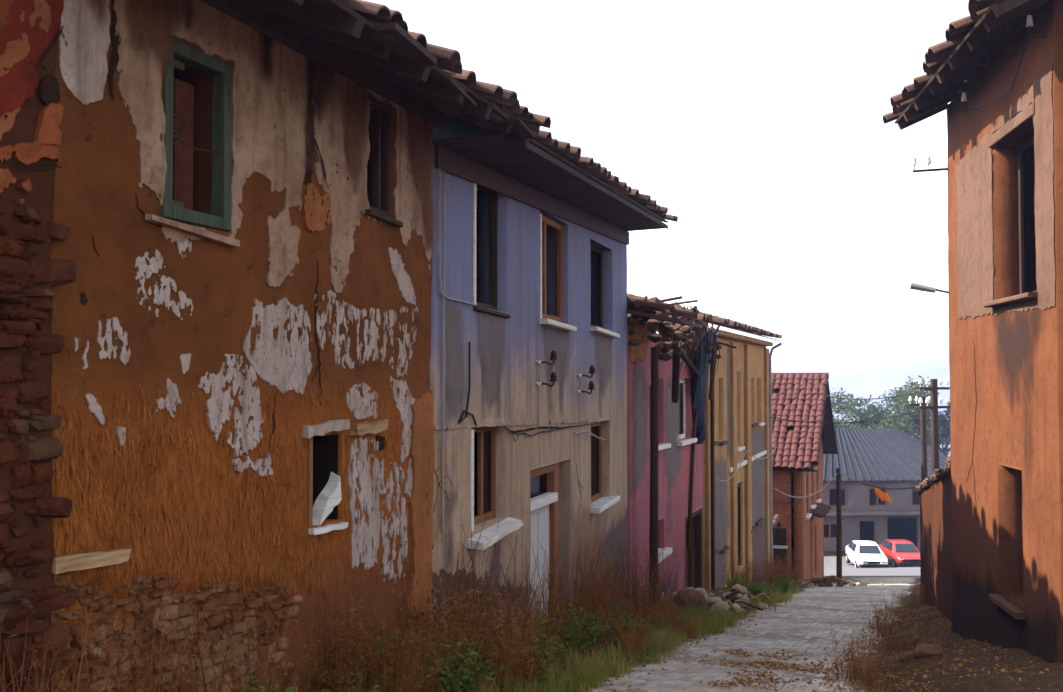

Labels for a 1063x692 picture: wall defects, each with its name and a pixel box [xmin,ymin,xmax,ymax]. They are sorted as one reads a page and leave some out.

crack [108,0,121,100]
flaking render [0,0,167,206]
flaking render [74,317,130,369]
flaking render [134,224,206,320]
flaking render [173,0,527,629]